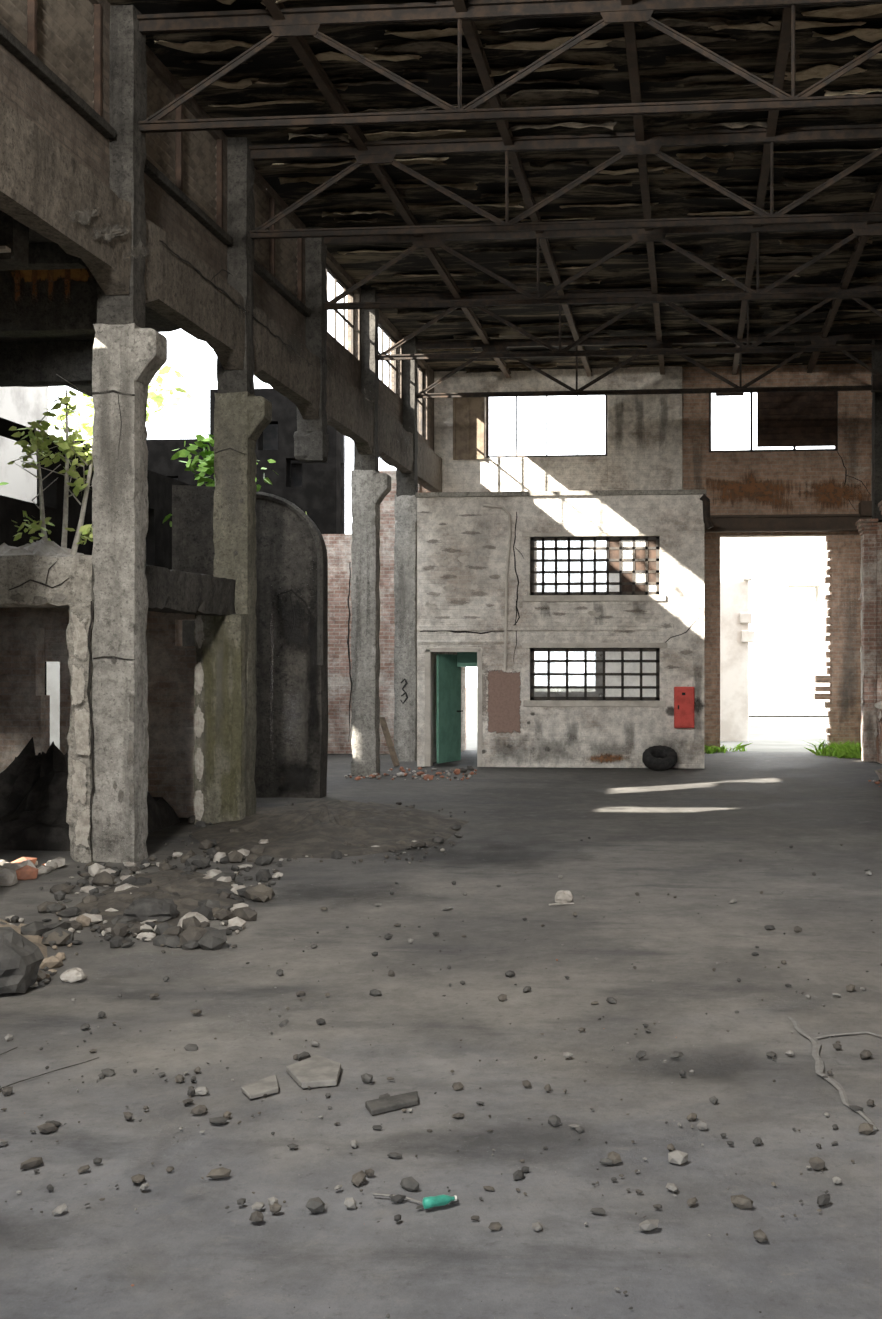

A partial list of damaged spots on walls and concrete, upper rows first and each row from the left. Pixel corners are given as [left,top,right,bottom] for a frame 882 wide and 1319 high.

peeling [154,4,882,118]
peeling [288,127,466,142]
peeling [508,120,617,131]
peeling [687,121,767,129]
peeling [270,145,882,223]
peeling [543,249,850,367]
flaking render [0,594,292,950]
crack [0,1047,99,1089]